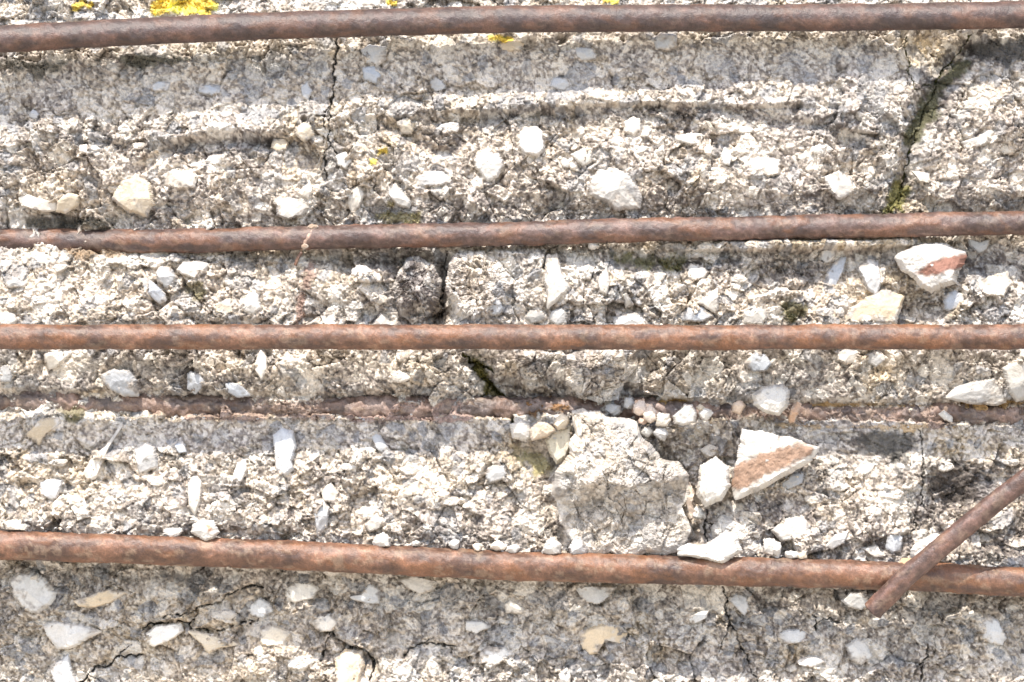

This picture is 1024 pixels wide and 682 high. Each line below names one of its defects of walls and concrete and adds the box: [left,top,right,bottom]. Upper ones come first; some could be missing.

crack [904,35,971,91]
crack [323,38,340,179]
spalling [11,137,323,227]
spalling [346,114,882,221]
spalling [0,256,296,324]
rust [184,399,473,422]
rust [518,395,569,417]
rust [714,401,956,433]
rust [961,400,1024,424]
spalling [0,434,571,543]
spalling [748,459,1024,557]
crack [80,584,264,682]